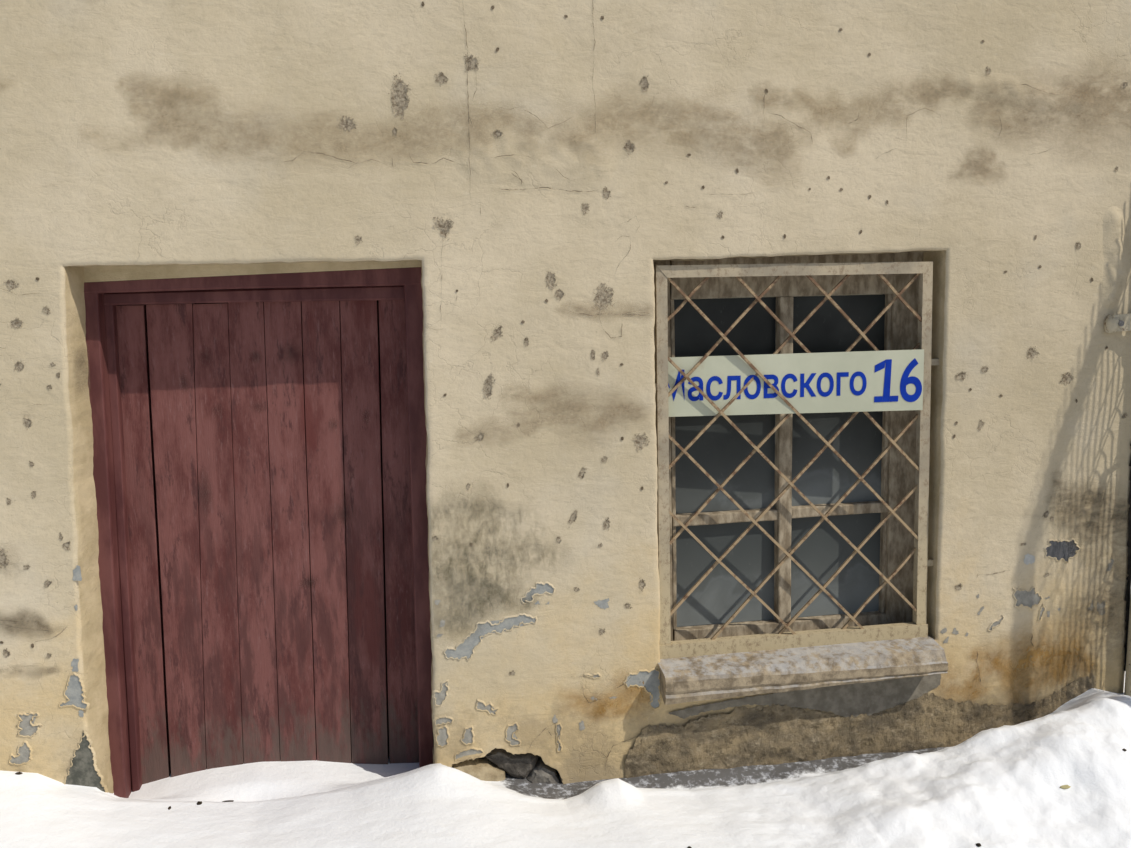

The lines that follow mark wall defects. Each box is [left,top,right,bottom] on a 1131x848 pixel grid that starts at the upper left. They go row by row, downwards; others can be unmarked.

crack [282,25,481,214]
peeling [437,581,556,662]
peeling [977,537,1081,632]
flaking render [432,679,570,784]
peeling [589,668,662,710]
flaking render [625,675,1096,778]